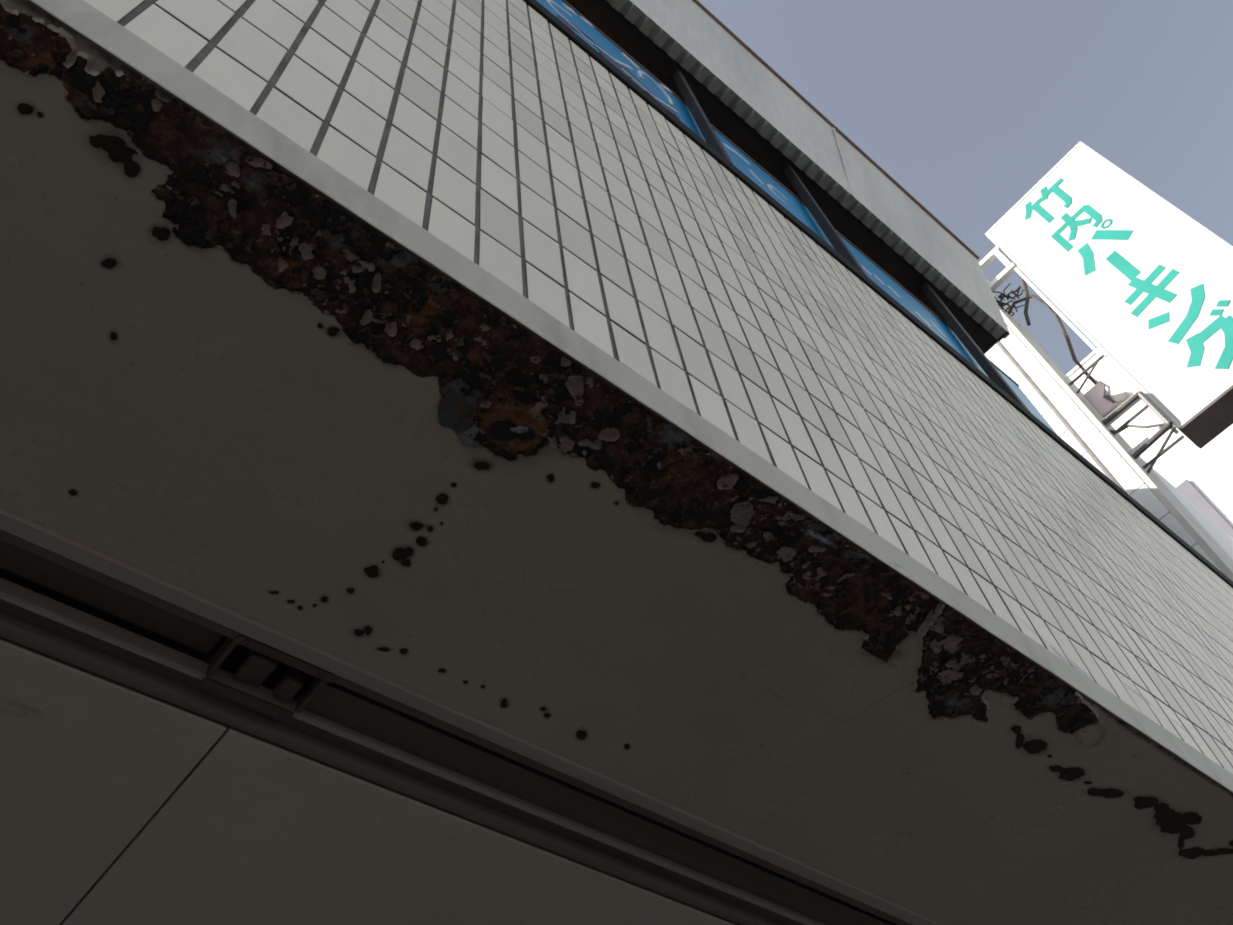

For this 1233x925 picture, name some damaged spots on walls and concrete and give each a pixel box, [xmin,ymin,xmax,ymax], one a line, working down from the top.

rust [0,0,1099,735]